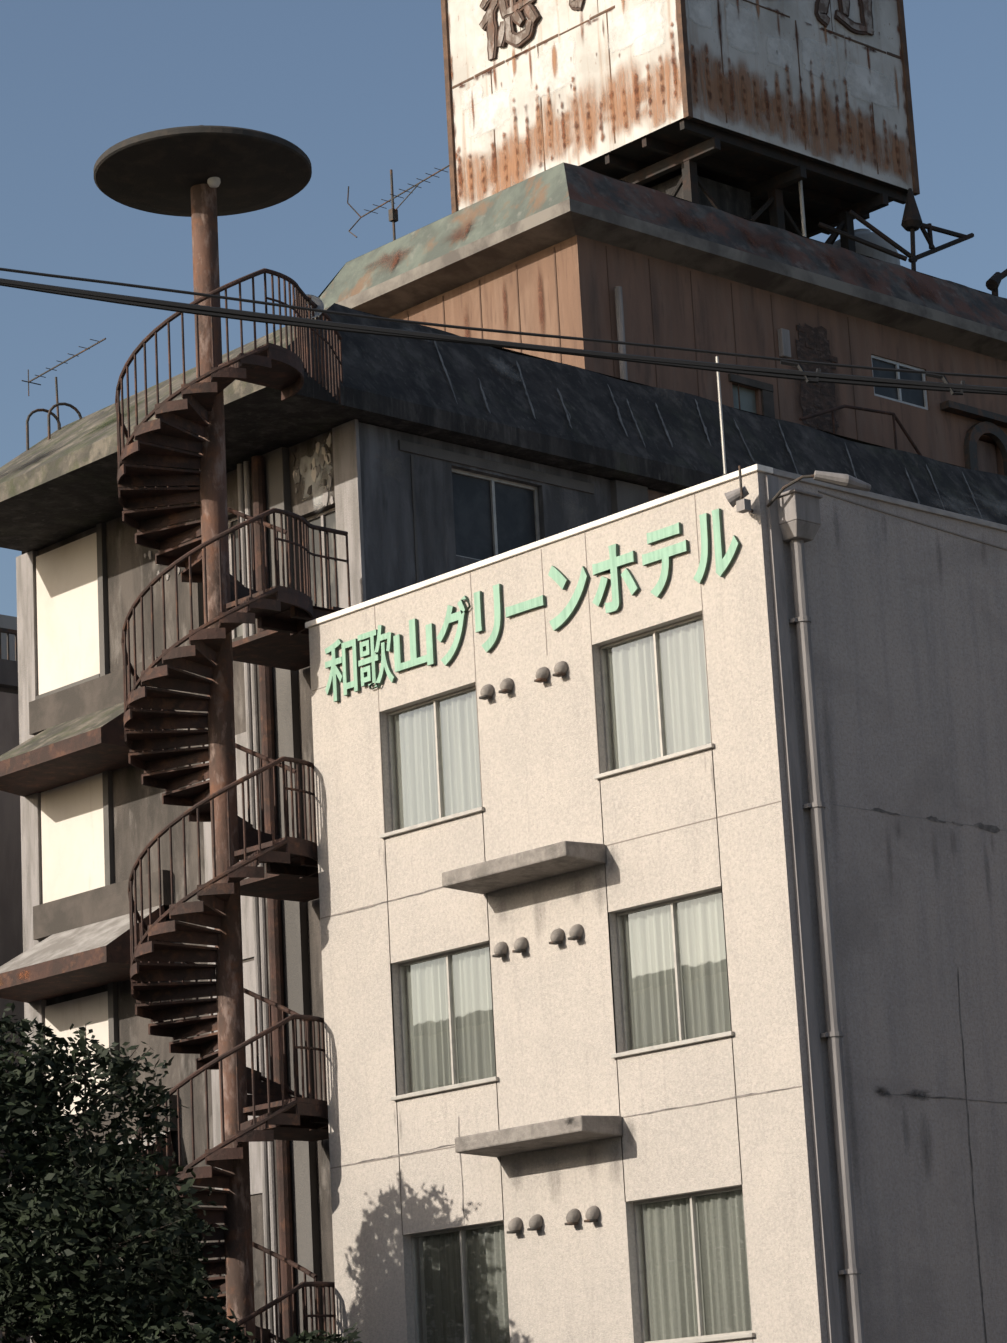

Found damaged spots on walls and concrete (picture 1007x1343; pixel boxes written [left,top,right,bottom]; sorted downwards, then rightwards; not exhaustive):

rust [450,17,911,203]
peeling [290,433,334,506]